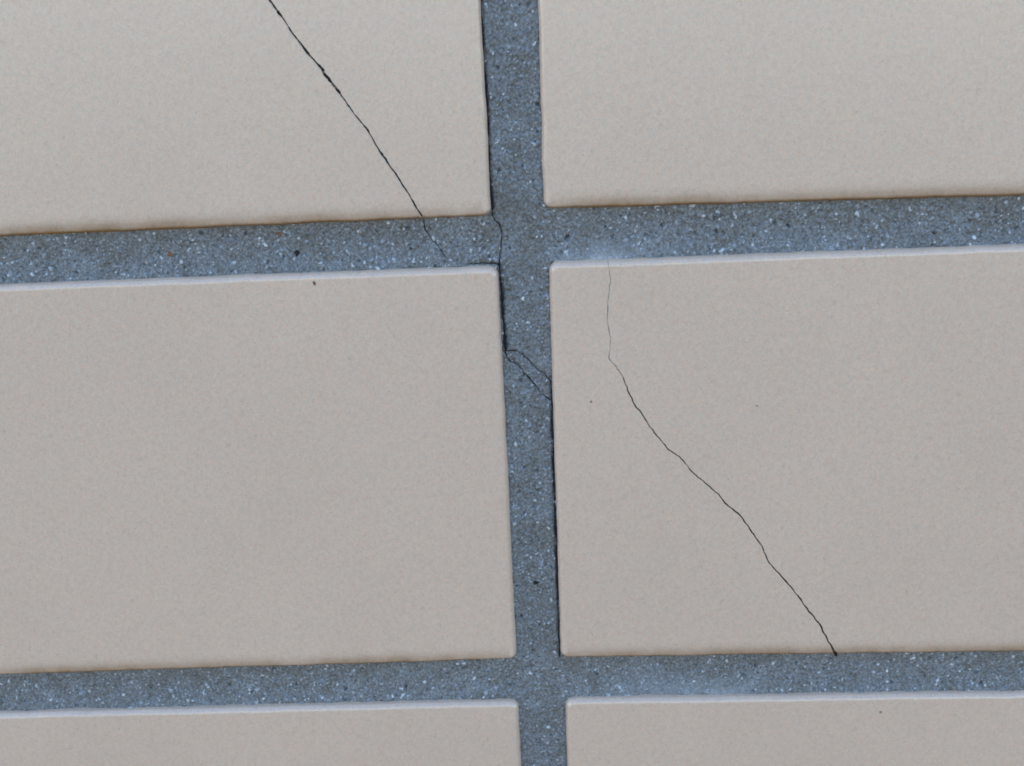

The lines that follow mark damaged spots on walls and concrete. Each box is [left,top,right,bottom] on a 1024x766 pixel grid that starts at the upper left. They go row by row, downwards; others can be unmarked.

crack [269,0,446,257]
crack [470,216,502,265]
crack [504,350,552,401]
crack [607,271,837,657]